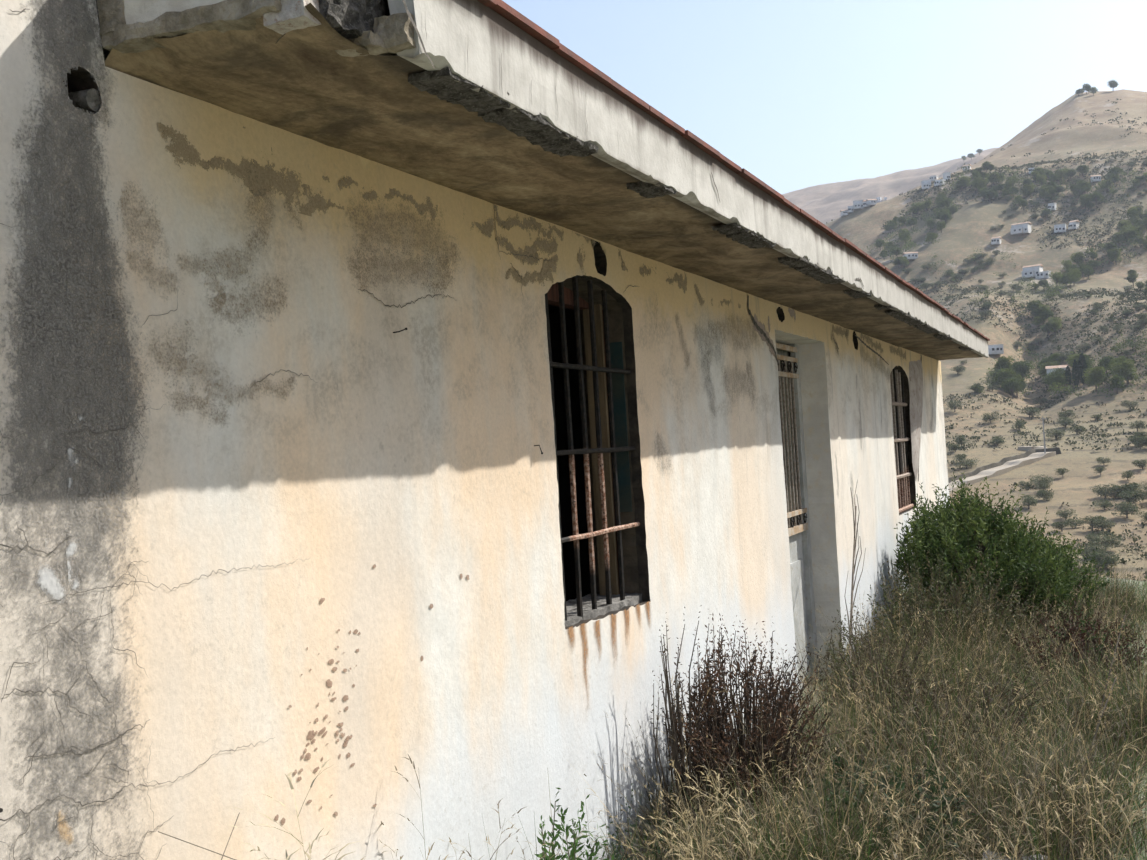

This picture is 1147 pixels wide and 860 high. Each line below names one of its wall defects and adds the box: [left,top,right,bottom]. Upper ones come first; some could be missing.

spalling [101,0,282,54]
spalling [408,67,599,157]
peeling [128,123,457,319]
peeling [463,204,596,286]
spalling [626,181,677,198]
spalling [711,223,973,351]
water stain [0,0,145,860]
crack [0,379,166,555]
corrosion [568,601,650,677]
crack [0,558,310,860]